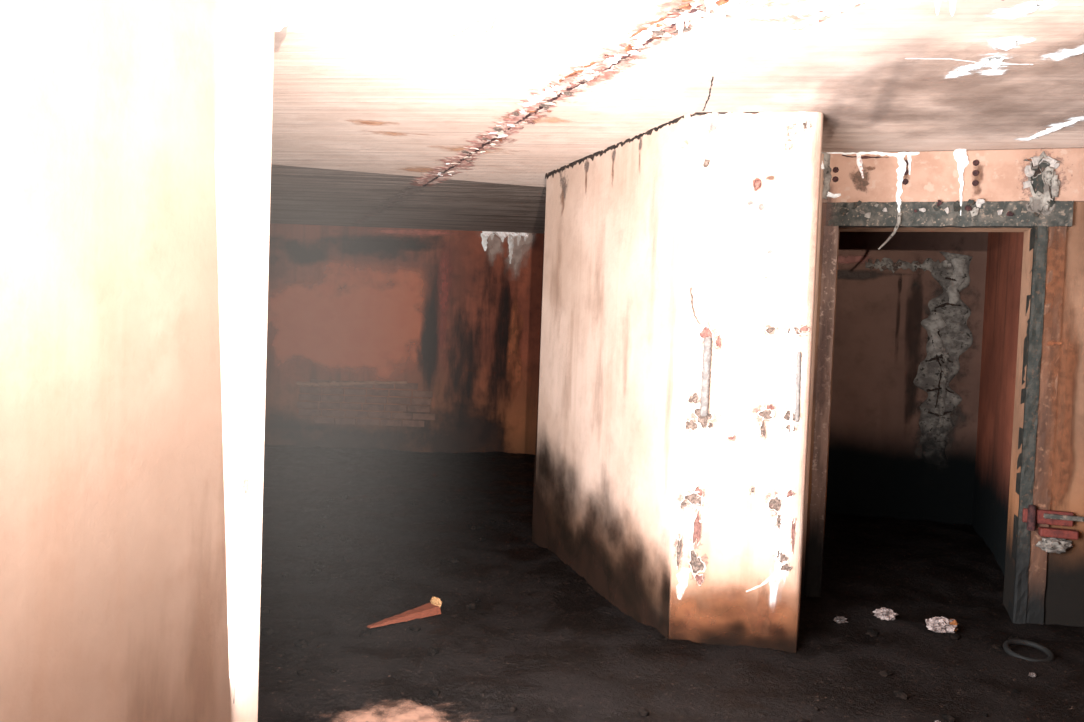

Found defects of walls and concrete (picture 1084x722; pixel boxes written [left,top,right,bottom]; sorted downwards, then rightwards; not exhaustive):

water stain [827,151,919,178]
spalling [1022,149,1066,217]
water stain [269,236,437,264]
water stain [481,231,533,267]
spalling [683,323,722,431]
spalling [753,352,802,440]
water stain [746,112,818,605]
spalling [764,324,811,336]
spalling [674,485,708,586]
spalling [750,486,796,571]